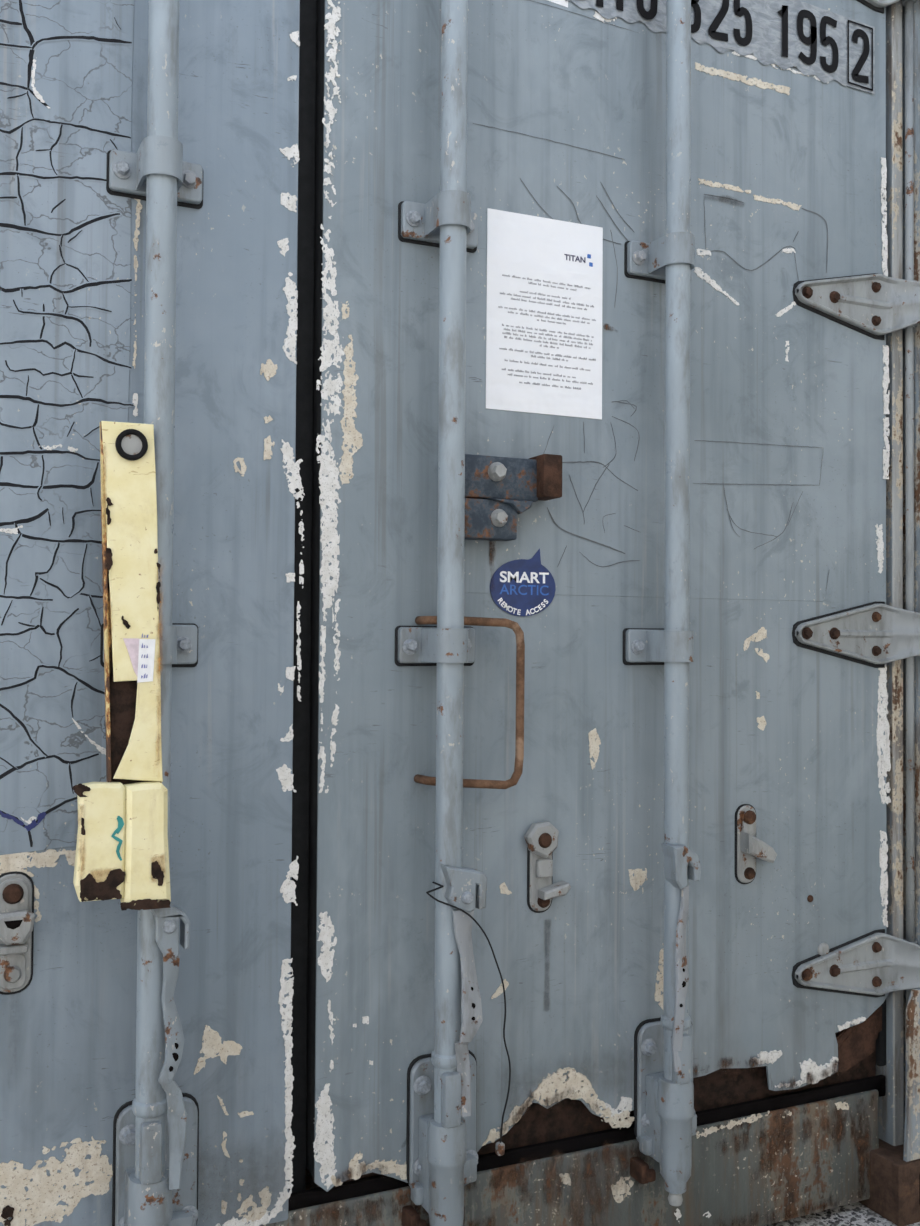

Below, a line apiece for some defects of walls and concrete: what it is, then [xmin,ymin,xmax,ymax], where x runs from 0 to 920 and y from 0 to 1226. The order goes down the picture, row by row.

crack [0,0,134,847]
peeling [260,0,363,793]
peeling [280,856,299,906]
peeling [317,911,337,982]
peeling [0,1136,113,1226]
peeling [216,958,296,1226]
peeling [313,1060,407,1190]
rust [467,1145,644,1226]
peeling [482,1067,634,1146]
rust [722,1116,812,1172]
peeling [775,1056,838,1088]
rust [827,1107,870,1188]